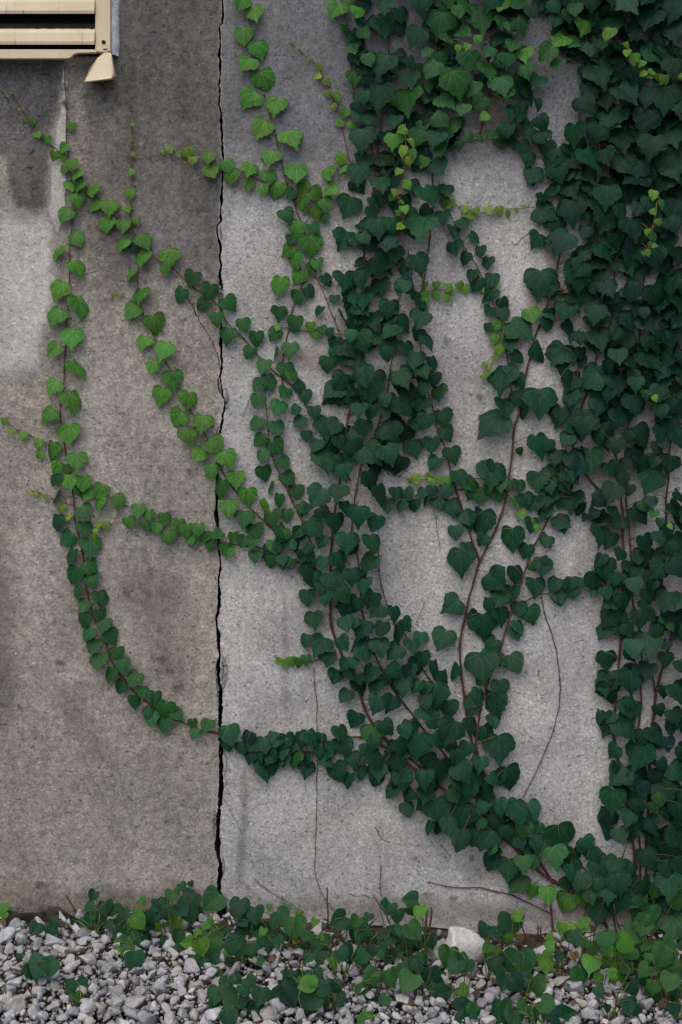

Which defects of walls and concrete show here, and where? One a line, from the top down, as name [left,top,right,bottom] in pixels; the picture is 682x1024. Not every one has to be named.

crack [187,0,226,434]
crack [214,461,226,919]